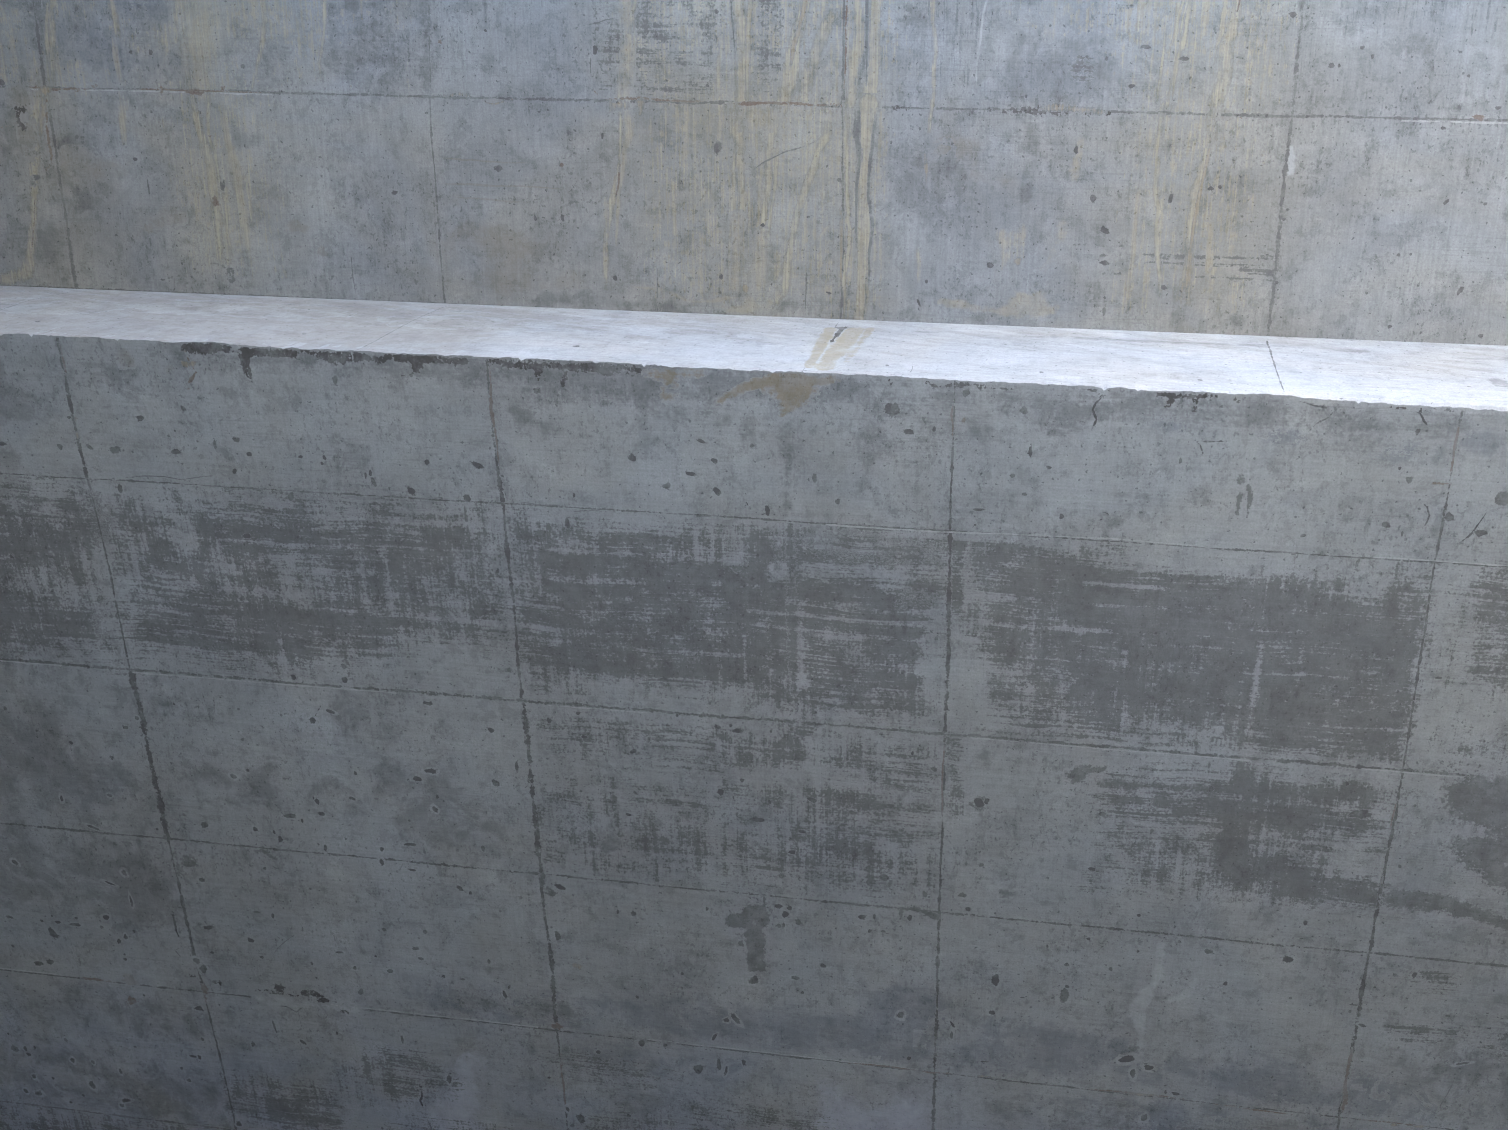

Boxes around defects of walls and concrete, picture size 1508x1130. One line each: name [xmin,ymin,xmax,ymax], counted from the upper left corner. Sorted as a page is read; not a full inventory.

corrosion [641,367,707,403]
corrosion [716,372,841,418]